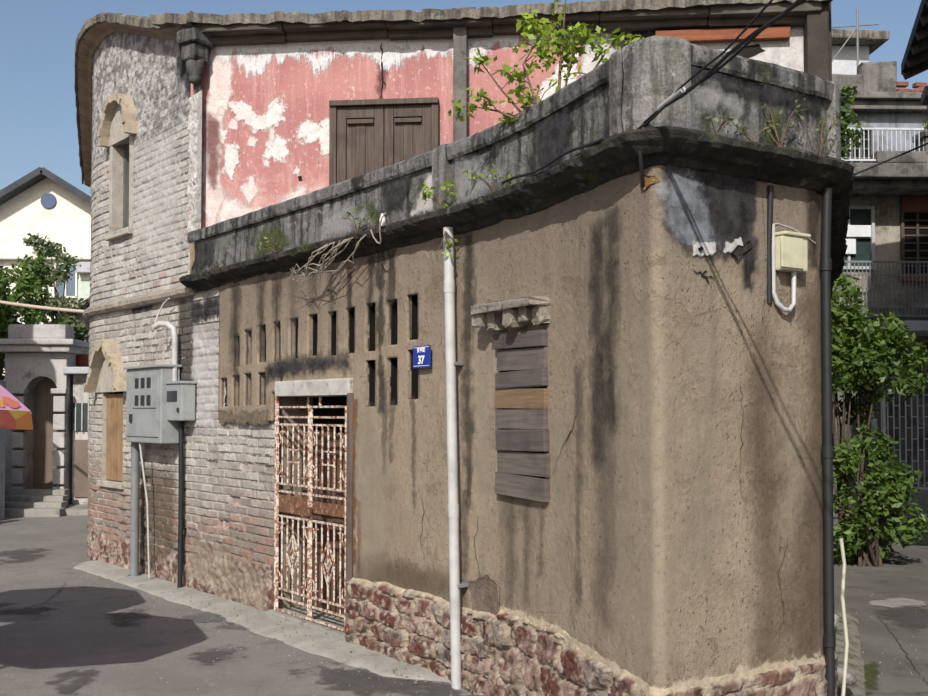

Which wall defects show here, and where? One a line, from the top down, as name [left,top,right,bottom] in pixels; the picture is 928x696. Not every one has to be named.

crack [379,43,387,99]
peeling [468,22,576,69]
peeling [201,39,453,227]
leakage [322,208,368,239]
leakage [381,174,410,213]
leakage [411,175,433,216]
leakage [456,162,502,203]
leakage [657,165,758,288]
spalling [731,240,753,260]
leakage [589,213,618,459]
corrosion [353,399,361,569]
spalling [467,574,622,675]